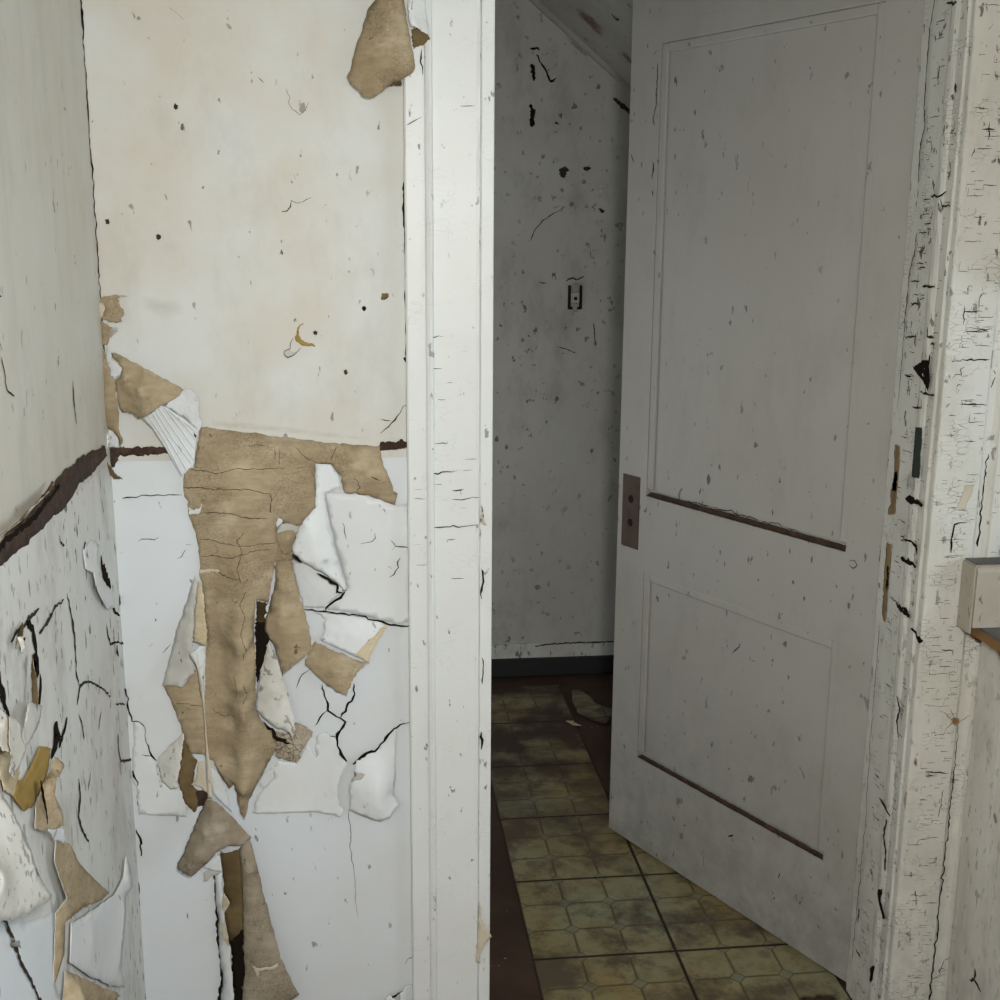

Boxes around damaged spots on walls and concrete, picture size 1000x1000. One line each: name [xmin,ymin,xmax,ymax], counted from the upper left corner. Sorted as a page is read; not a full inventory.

peeling [408,0,430,35]
crack [852,0,1000,1000]
peeling [83,539,114,610]
peeling [292,464,409,663]
peeling [0,622,133,1000]
peeling [132,722,187,817]
peeling [163,576,208,708]
peeling [255,642,296,737]
crack [264,722,290,744]
peeling [252,729,400,821]
crack [296,671,410,765]
peeling [214,873,245,1000]